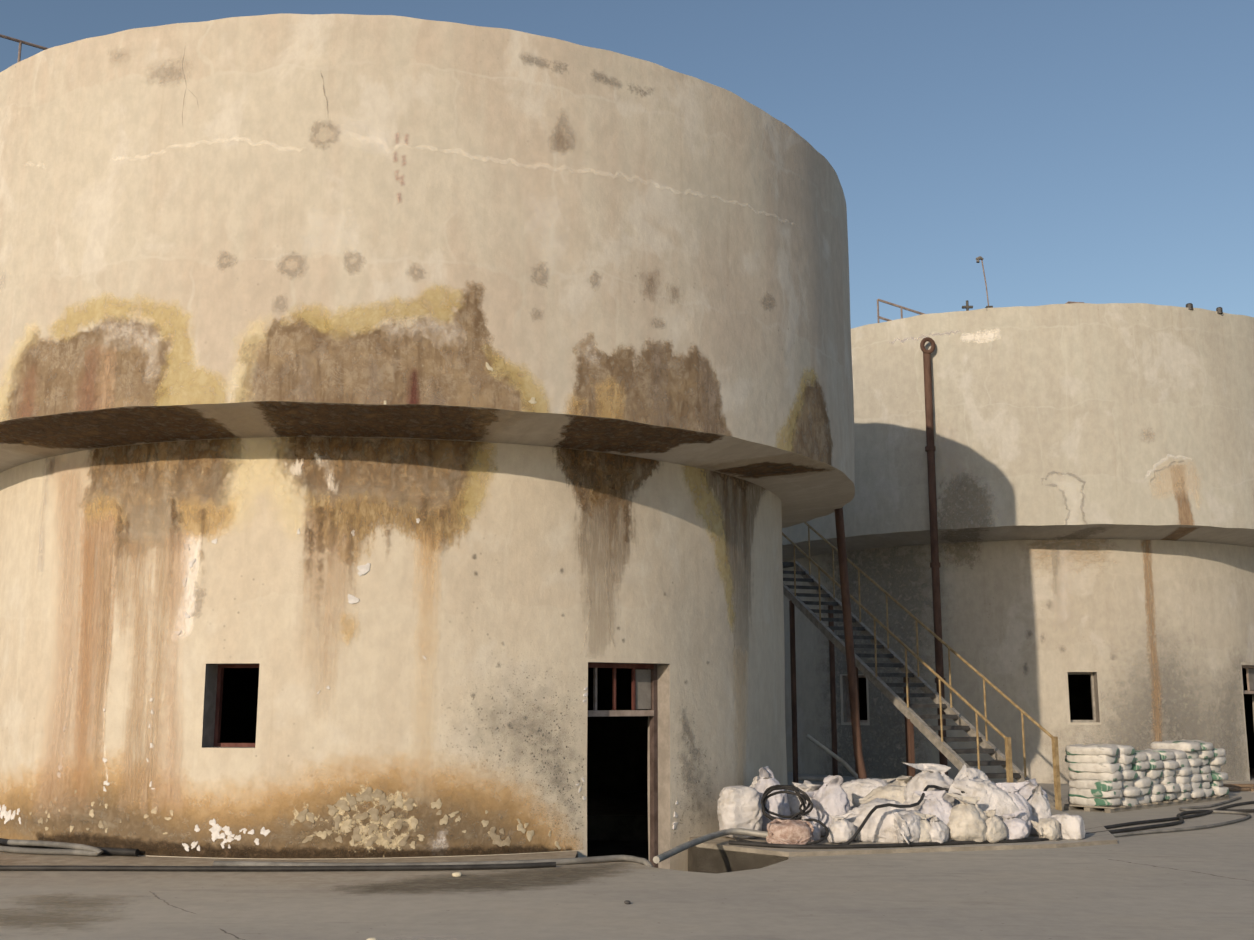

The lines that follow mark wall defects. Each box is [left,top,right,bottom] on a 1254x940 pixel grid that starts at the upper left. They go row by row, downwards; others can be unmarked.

leakage [556,336,732,555]
leakage [685,371,833,622]
leakage [938,473,992,562]
leakage [0,284,574,859]
corrosion [1142,461,1196,742]
peeling [291,785,425,850]
peeling [431,798,466,833]
peeling [481,810,561,849]
leakage [360,864,619,893]